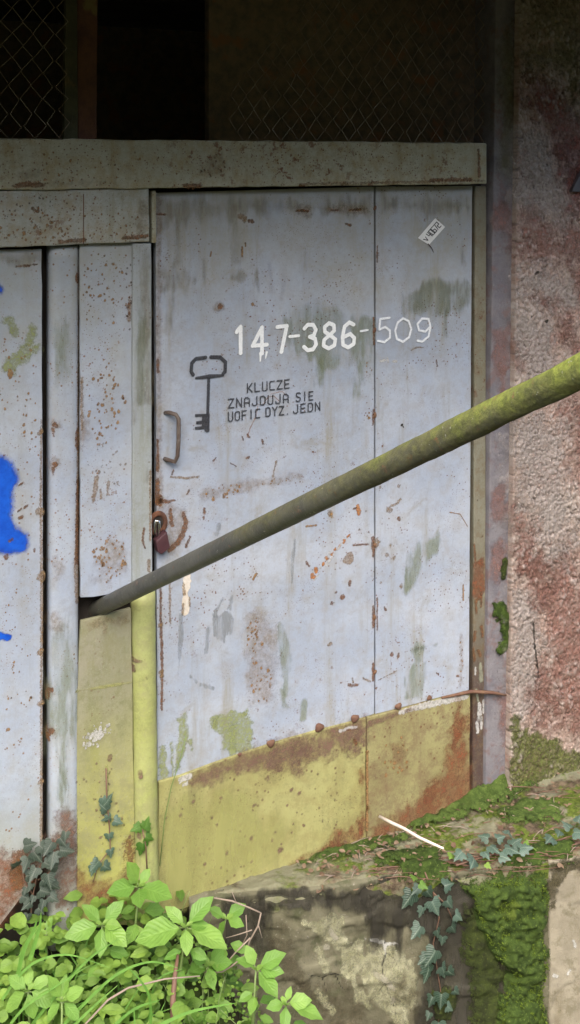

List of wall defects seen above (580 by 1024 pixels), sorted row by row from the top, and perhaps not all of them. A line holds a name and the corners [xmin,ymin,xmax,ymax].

rust [74,253,132,604]
rust [141,439,198,572]
rust [0,336,130,917]
rust [247,618,272,702]
peeling [82,722,111,749]
rust [116,803,144,880]
rust [192,707,470,852]
leakage [223,876,478,1024]